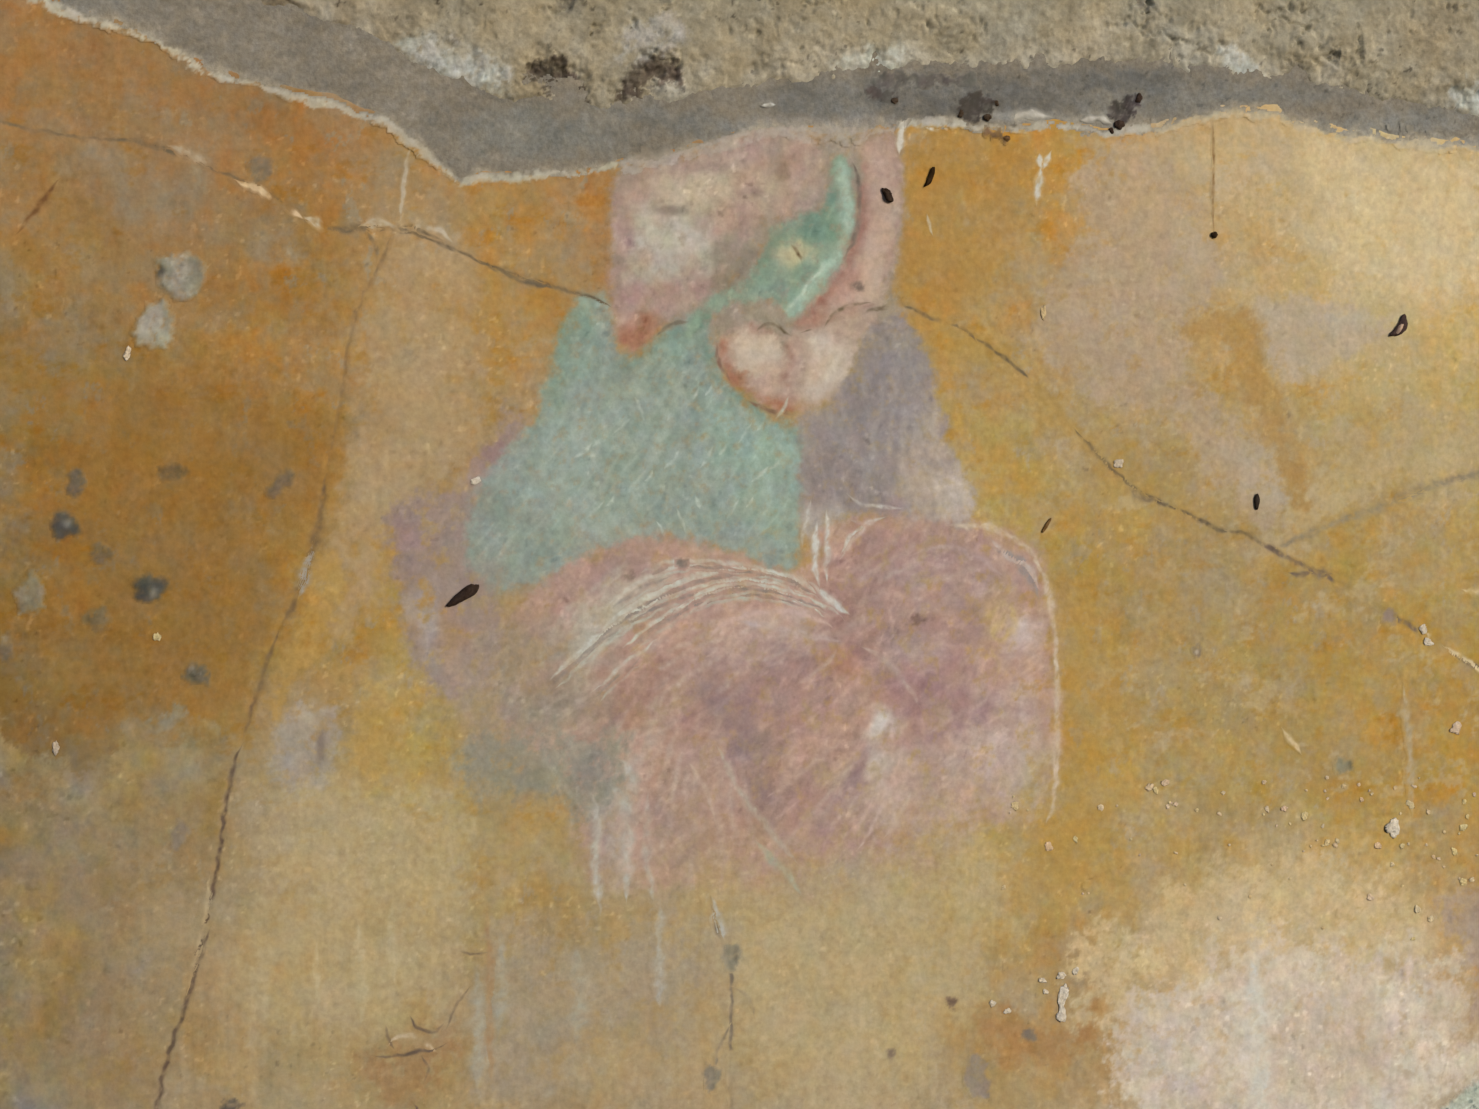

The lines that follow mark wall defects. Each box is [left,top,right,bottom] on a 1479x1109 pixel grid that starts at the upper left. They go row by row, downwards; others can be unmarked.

crack [0,118,614,1109]
crack [754,300,1479,674]
leakage [708,825,1479,1109]